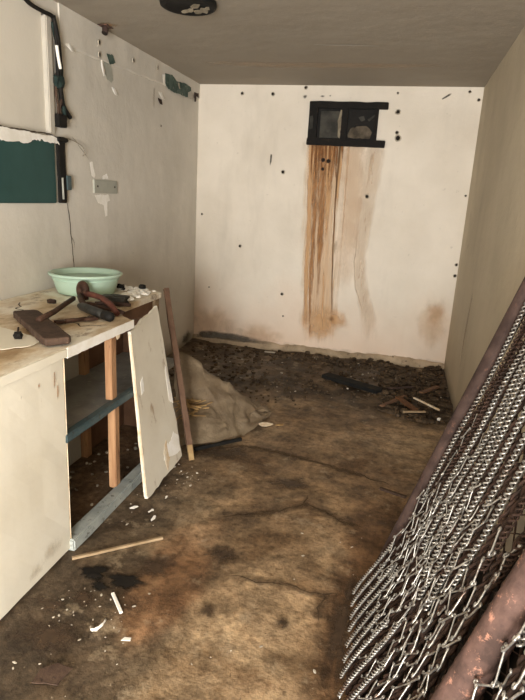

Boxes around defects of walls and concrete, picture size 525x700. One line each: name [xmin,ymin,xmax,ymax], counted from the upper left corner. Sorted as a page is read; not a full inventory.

peeling [97,39,118,96]
peeling [156,65,199,105]
flaking render [0,126,60,145]
peeling [95,194,110,217]
corrosion [304,145,343,335]
crack [215,446,391,486]
crack [223,495,364,528]
crack [225,575,345,620]